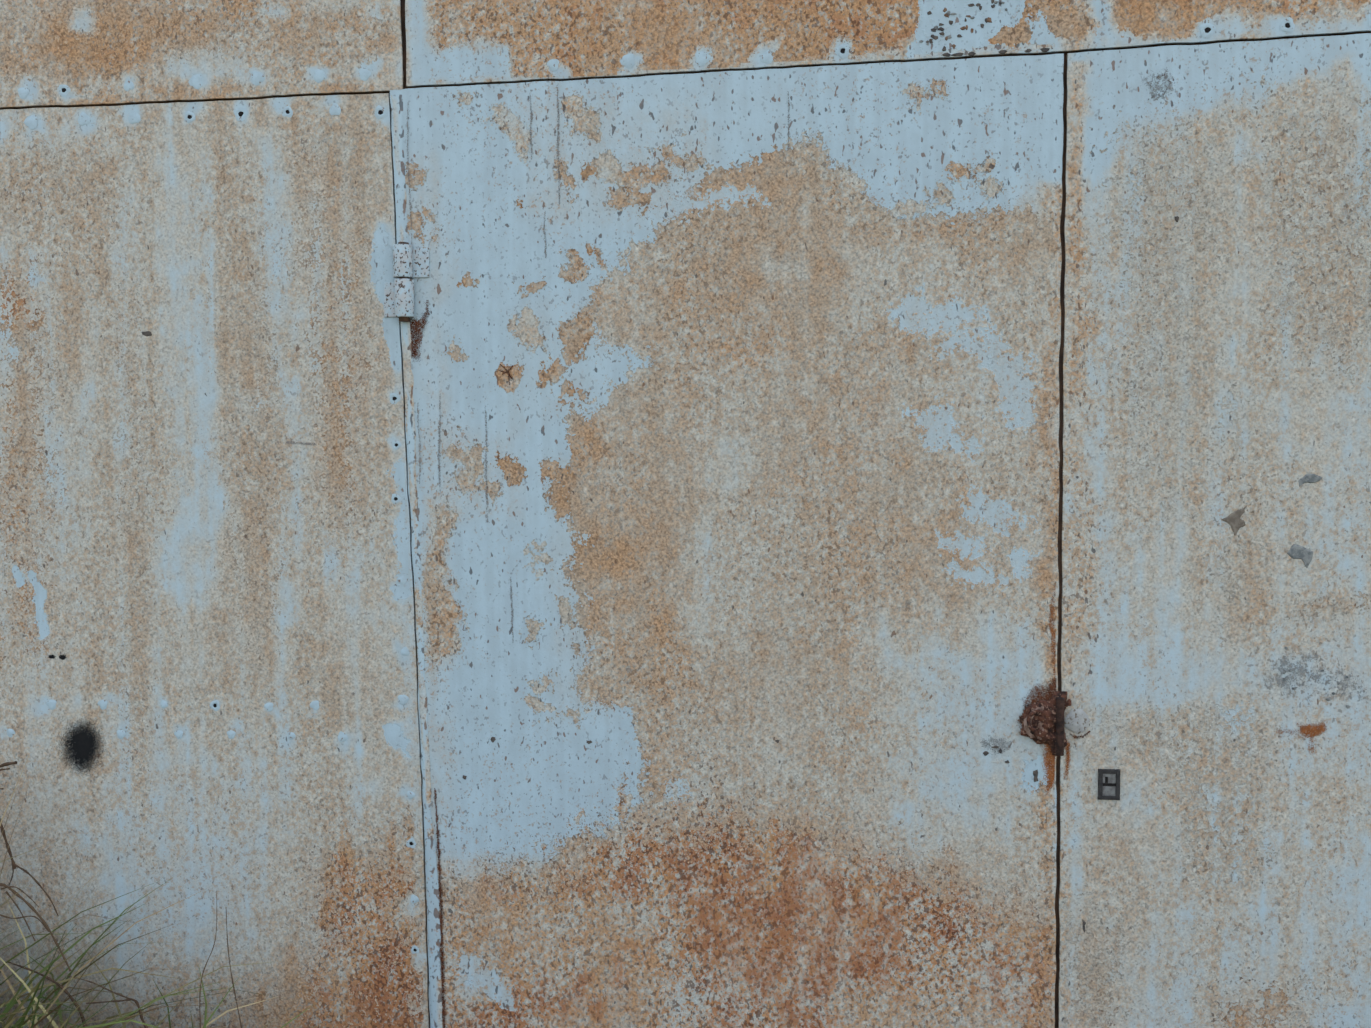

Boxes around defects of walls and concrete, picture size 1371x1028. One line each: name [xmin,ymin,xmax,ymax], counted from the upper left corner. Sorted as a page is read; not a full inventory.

rust [0,248,88,695]
rust [204,115,389,687]
rust [410,297,430,361]
rust [424,0,920,220]
peeling [440,128,1058,936]
rust [890,155,1007,224]
rust [988,0,1091,51]
rust [1110,0,1370,43]
rust [1246,69,1371,383]
rust [1040,691,1327,898]
peeling [452,951,521,1011]
rust [1184,959,1324,1028]